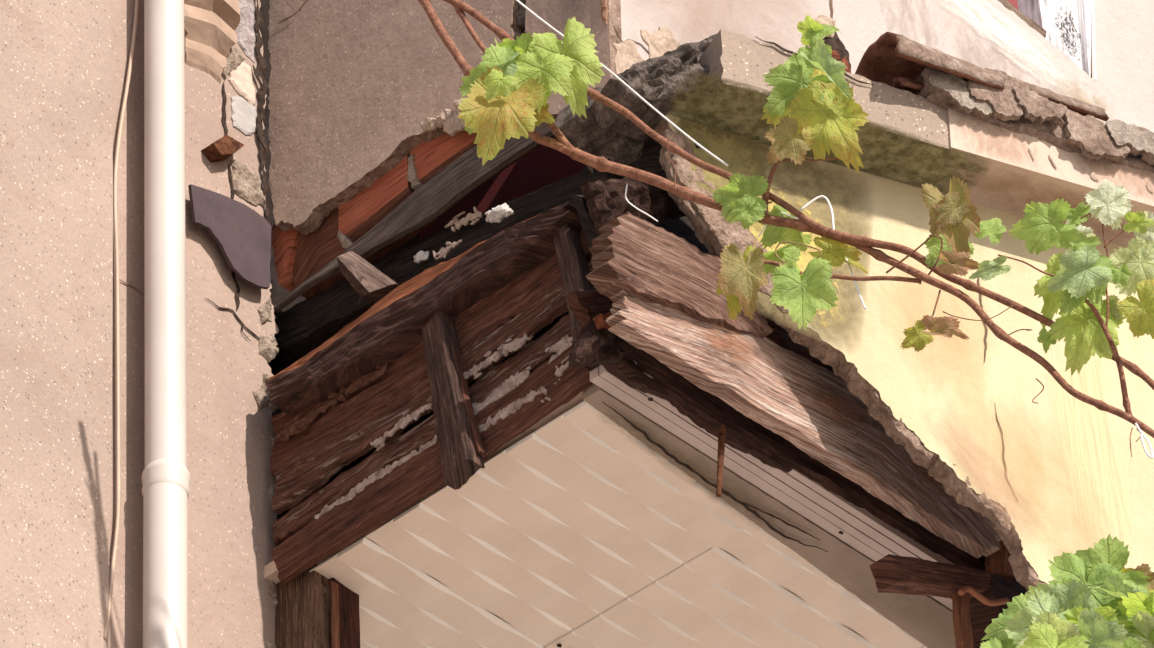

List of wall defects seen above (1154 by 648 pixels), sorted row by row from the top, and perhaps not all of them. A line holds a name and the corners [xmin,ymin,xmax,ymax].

crack [222,0,307,225]
spalling [420,96,468,137]
crack [206,271,260,341]